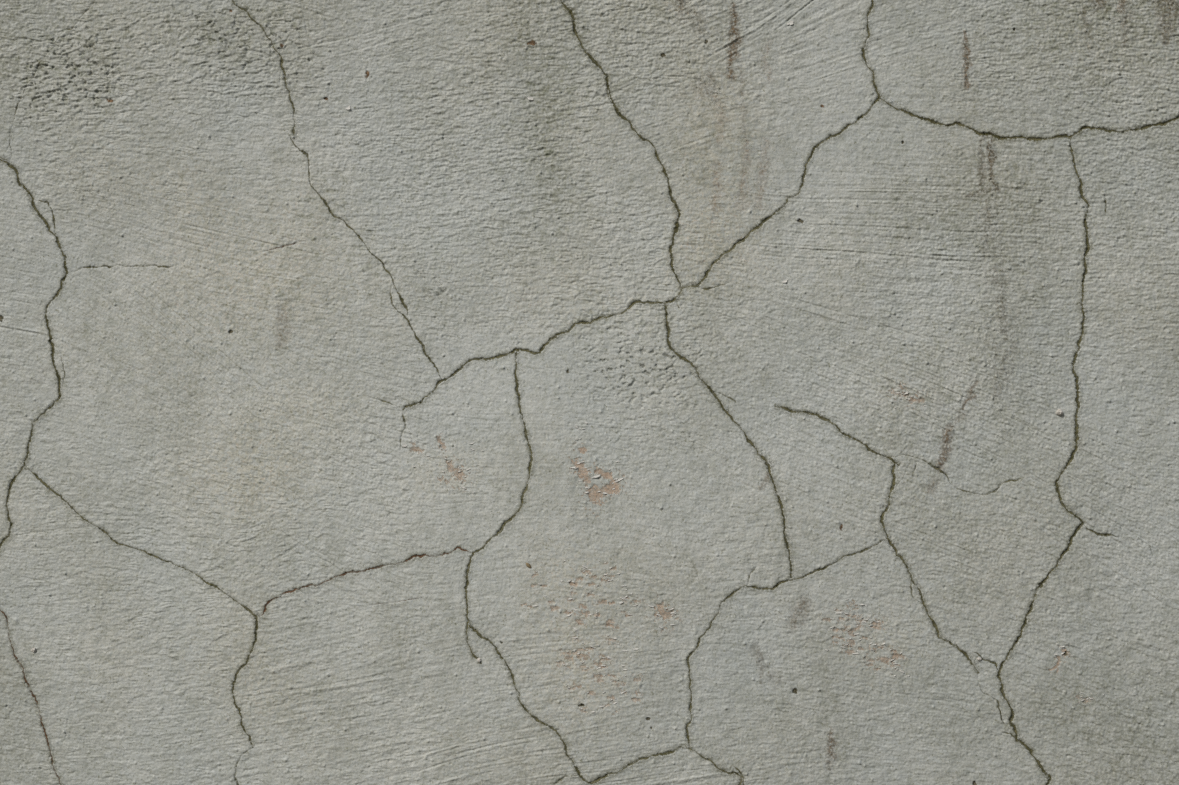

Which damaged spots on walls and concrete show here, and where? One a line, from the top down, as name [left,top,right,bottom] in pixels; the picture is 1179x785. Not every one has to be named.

crack [233,2,295,114]
crack [0,610,60,780]
crack [0,147,384,747]
crack [289,0,1179,785]